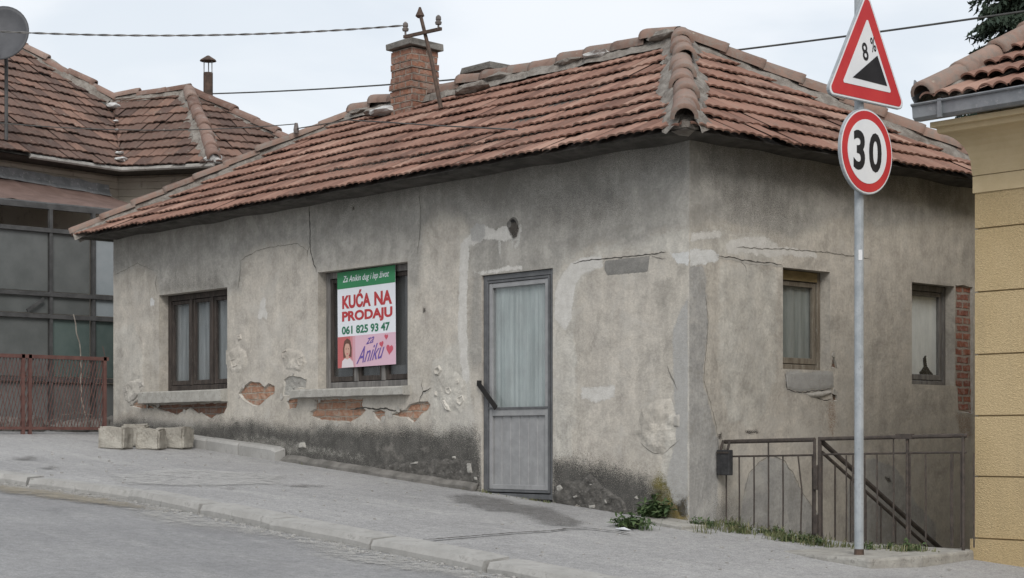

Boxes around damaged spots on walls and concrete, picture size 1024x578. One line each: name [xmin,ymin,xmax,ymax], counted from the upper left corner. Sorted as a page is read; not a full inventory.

spalling [507,217,519,239]
crack [238,206,317,286]
crack [573,252,665,264]
crack [717,246,869,267]
flaking render [123,372,307,419]
flaking render [310,397,430,427]
leakage [113,407,689,527]